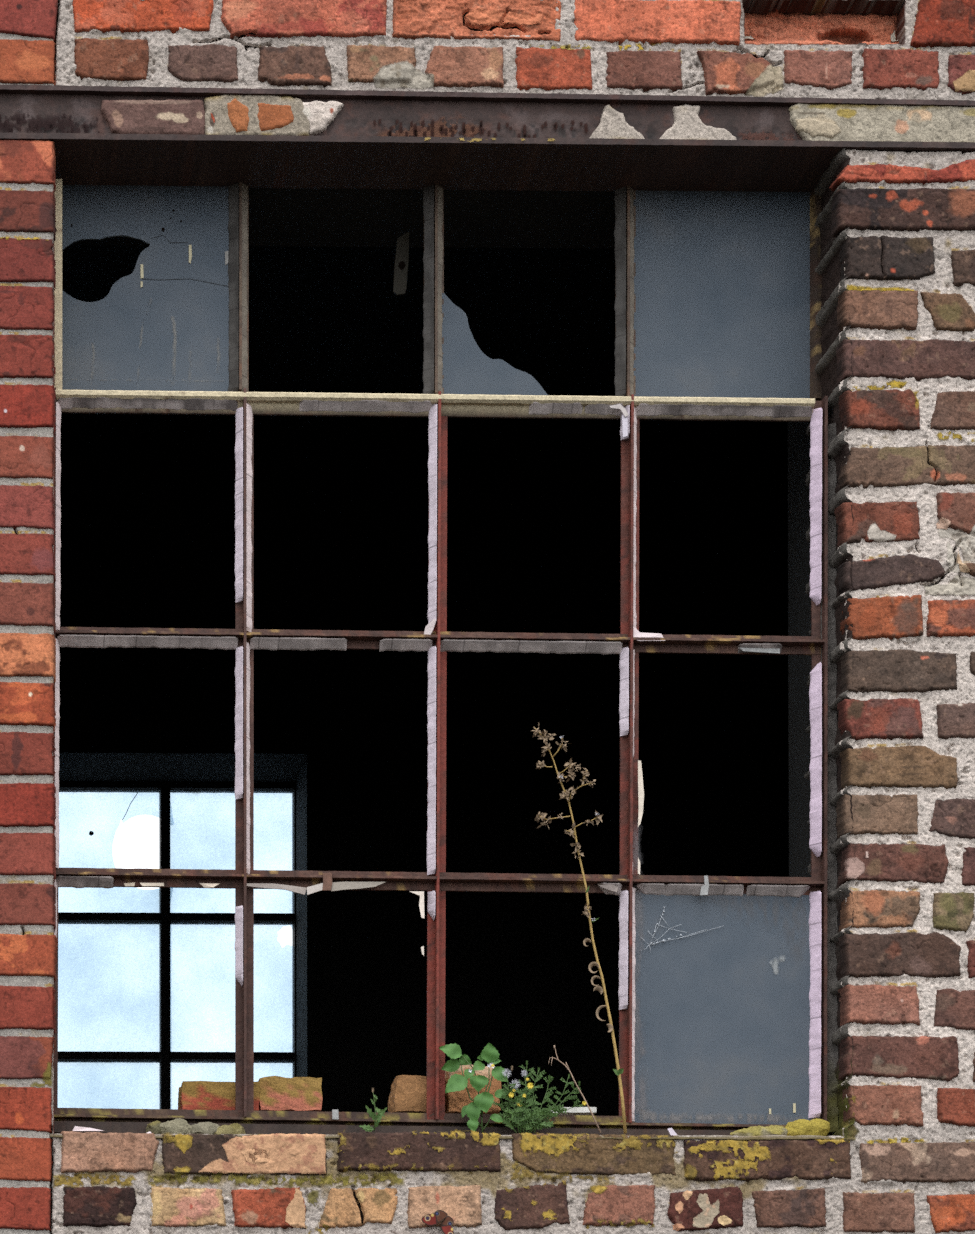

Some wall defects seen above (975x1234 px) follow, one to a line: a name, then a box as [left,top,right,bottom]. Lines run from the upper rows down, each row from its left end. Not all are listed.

corrosion [0,113,99,133]
spalling [211,98,294,133]
corrosion [373,118,588,138]
water stain [496,1133,609,1220]
water stain [613,1135,770,1180]
spalling [672,1190,732,1231]